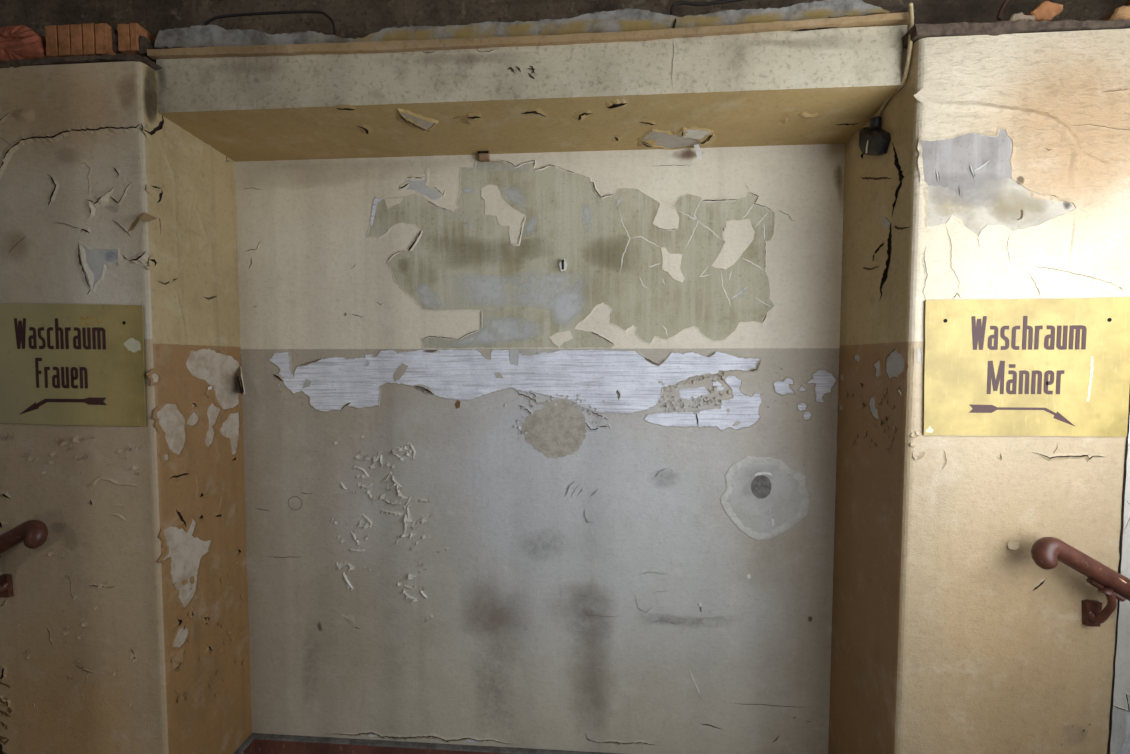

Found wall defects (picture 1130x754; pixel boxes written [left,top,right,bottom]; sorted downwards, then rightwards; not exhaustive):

crack [47,174,90,235]
crack [0,108,167,179]
peeling [636,127,718,160]
crack [860,141,1125,301]
peeling [917,126,1079,239]
crack [1069,123,1130,132]
peeling [268,158,844,458]
flaking render [720,456,809,540]
crack [941,450,949,470]
peeling [158,516,214,672]
crack [1032,389,1130,754]
peeling [1110,693,1130,754]